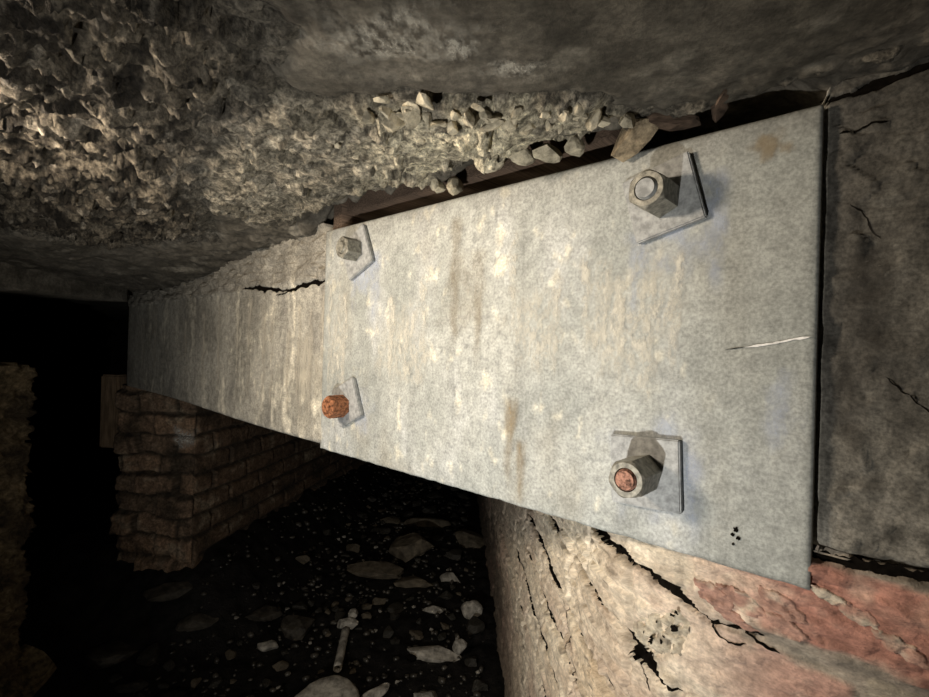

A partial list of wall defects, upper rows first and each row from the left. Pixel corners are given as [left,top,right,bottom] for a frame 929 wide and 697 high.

spalling [0,0,710,251]
crack [245,280,325,296]
crack [516,514,583,697]
crack [579,561,683,692]
crack [595,528,780,654]
crack [812,549,929,582]